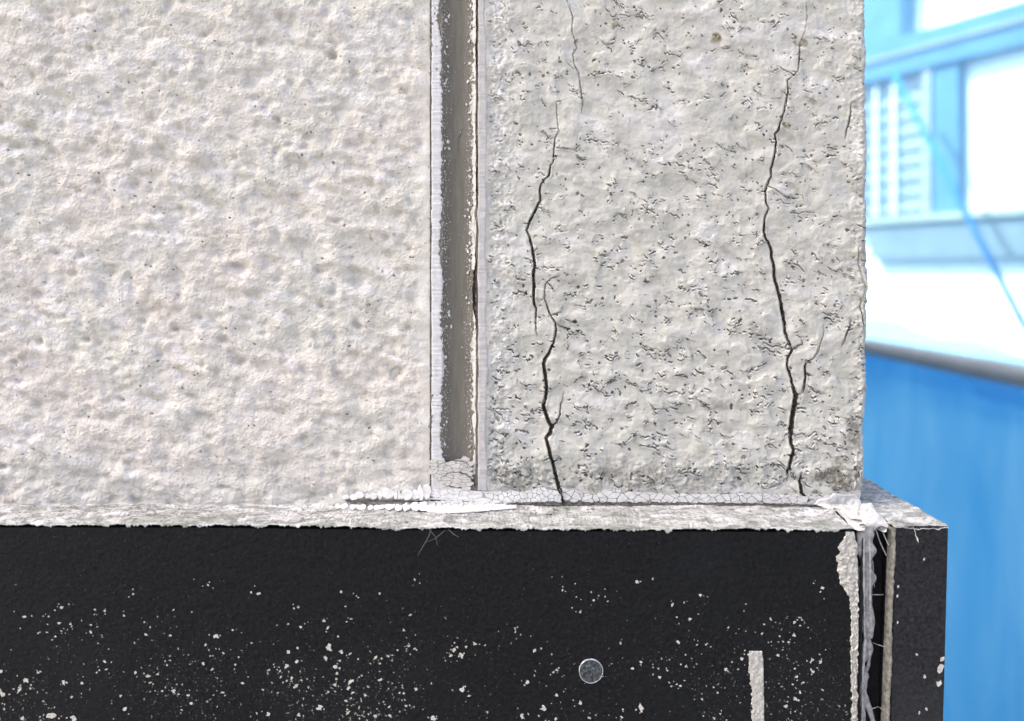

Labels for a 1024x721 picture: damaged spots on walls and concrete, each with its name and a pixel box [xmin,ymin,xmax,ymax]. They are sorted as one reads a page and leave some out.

peeling [329,0,888,721]
crack [506,0,864,507]
peeling [297,619,437,721]